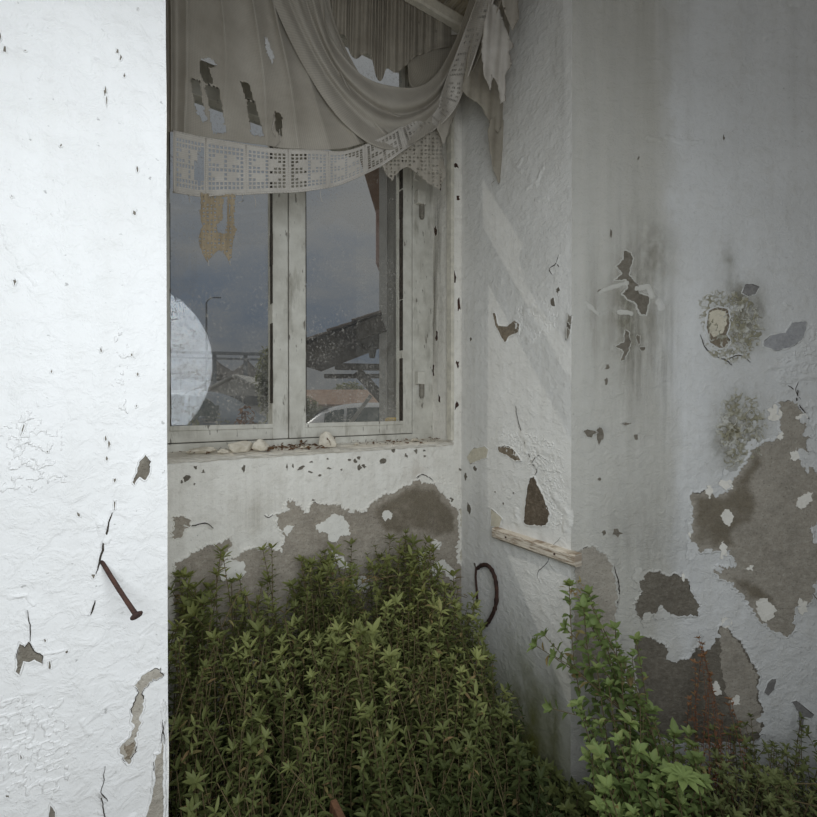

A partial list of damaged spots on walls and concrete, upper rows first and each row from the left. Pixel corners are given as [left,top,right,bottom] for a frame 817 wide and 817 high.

peeling [613,249,651,317]
peeling [285,456,367,477]
peeling [458,445,522,481]
peeling [583,427,604,445]
spalling [523,475,552,528]
spalling [685,388,817,640]
spalling [169,478,472,668]
spalling [568,543,620,682]
peeling [13,638,52,677]
spalling [625,567,777,747]
peeling [117,666,165,766]